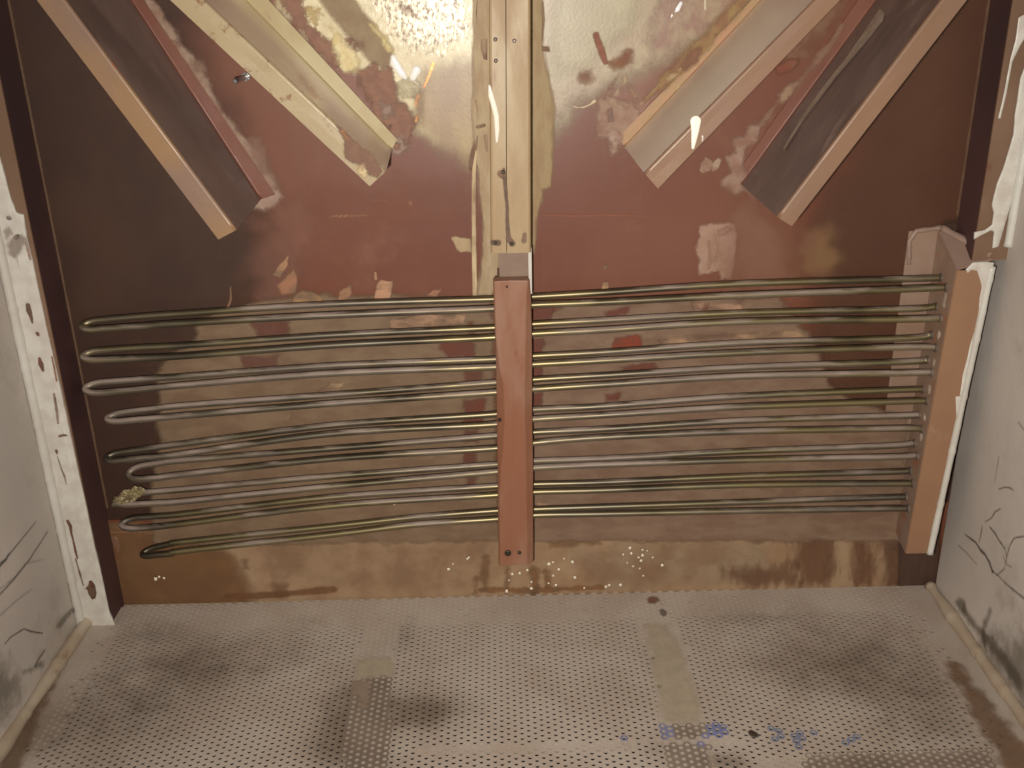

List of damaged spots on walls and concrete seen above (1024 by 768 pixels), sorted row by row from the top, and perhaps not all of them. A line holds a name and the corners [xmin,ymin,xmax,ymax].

peeling [279,0,418,155]